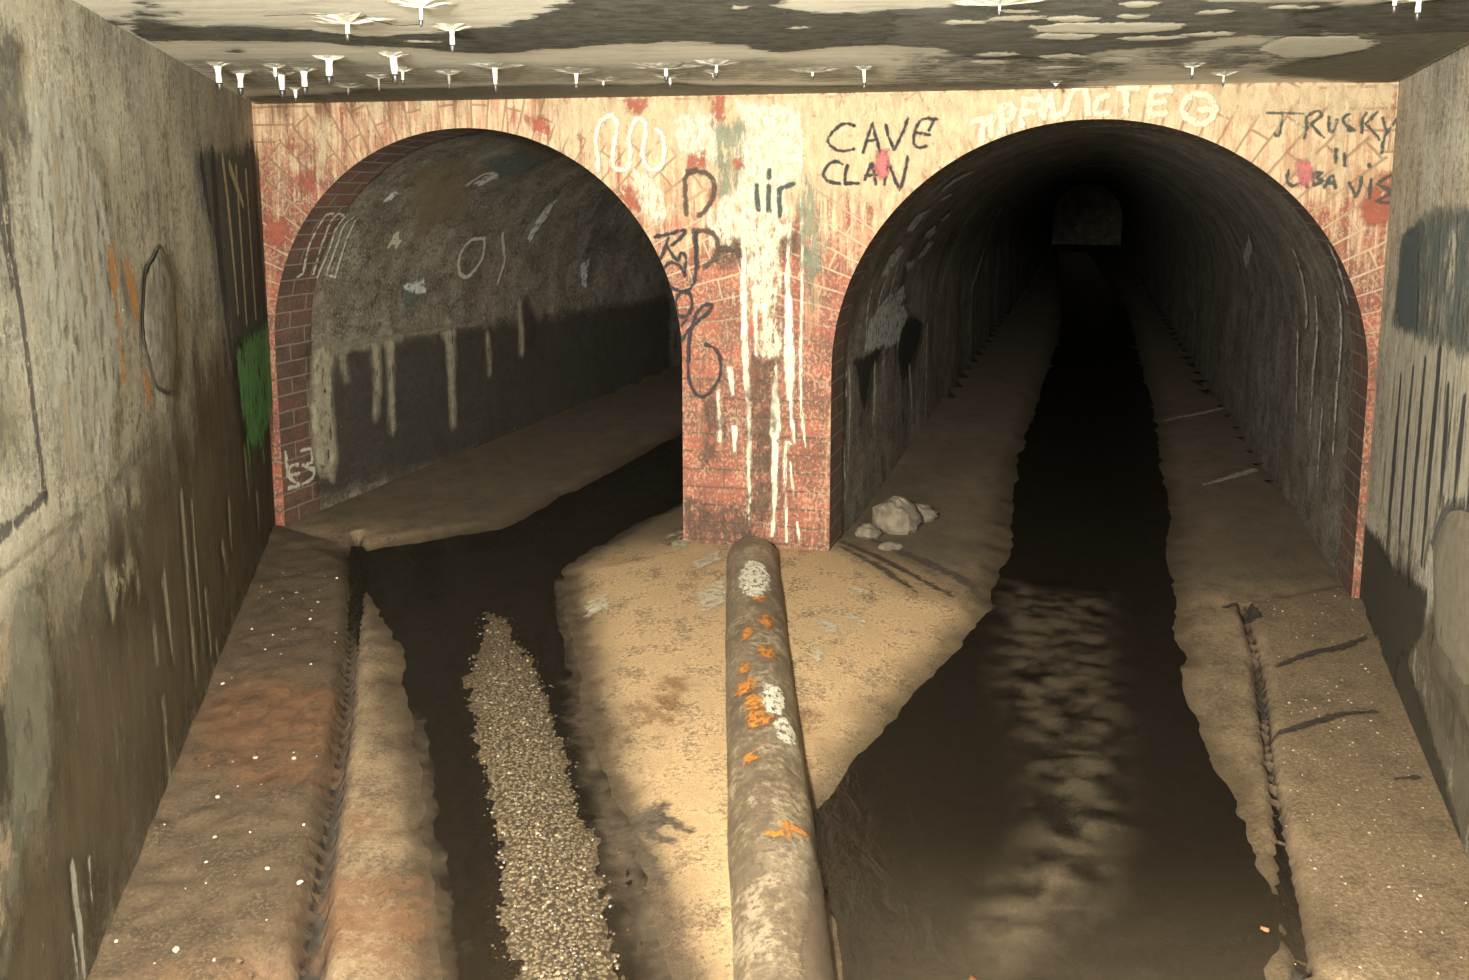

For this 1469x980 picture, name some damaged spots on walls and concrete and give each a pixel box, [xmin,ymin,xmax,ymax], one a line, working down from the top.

peeling [106,0,1469,87]
leakage [245,31,1469,543]